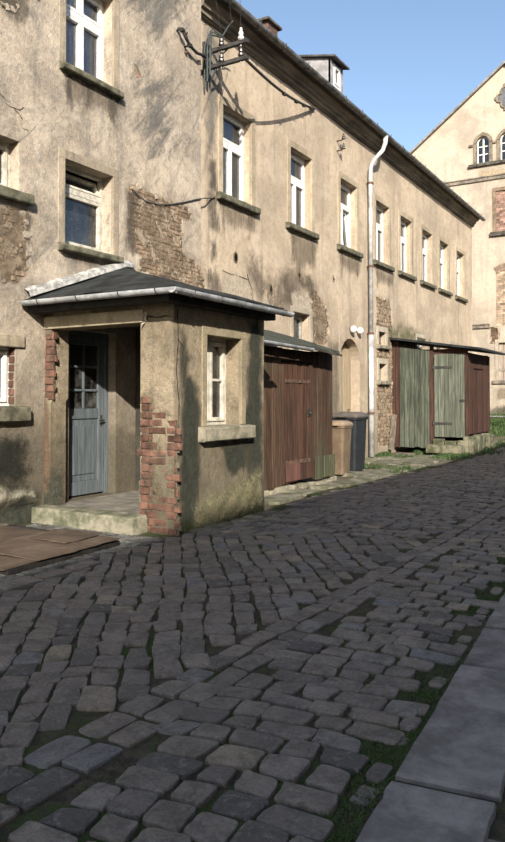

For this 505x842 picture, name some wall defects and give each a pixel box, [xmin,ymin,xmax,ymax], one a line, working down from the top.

leakage [128,0,187,35]
crack [0,94,29,132]
leakage [136,77,179,158]
spalling [0,205,32,284]
peeling [127,183,205,288]
flaking render [45,332,58,401]
flaking render [376,296,393,448]
leakage [0,438,60,525]
flaking render [137,396,182,536]
leakage [181,339,199,529]